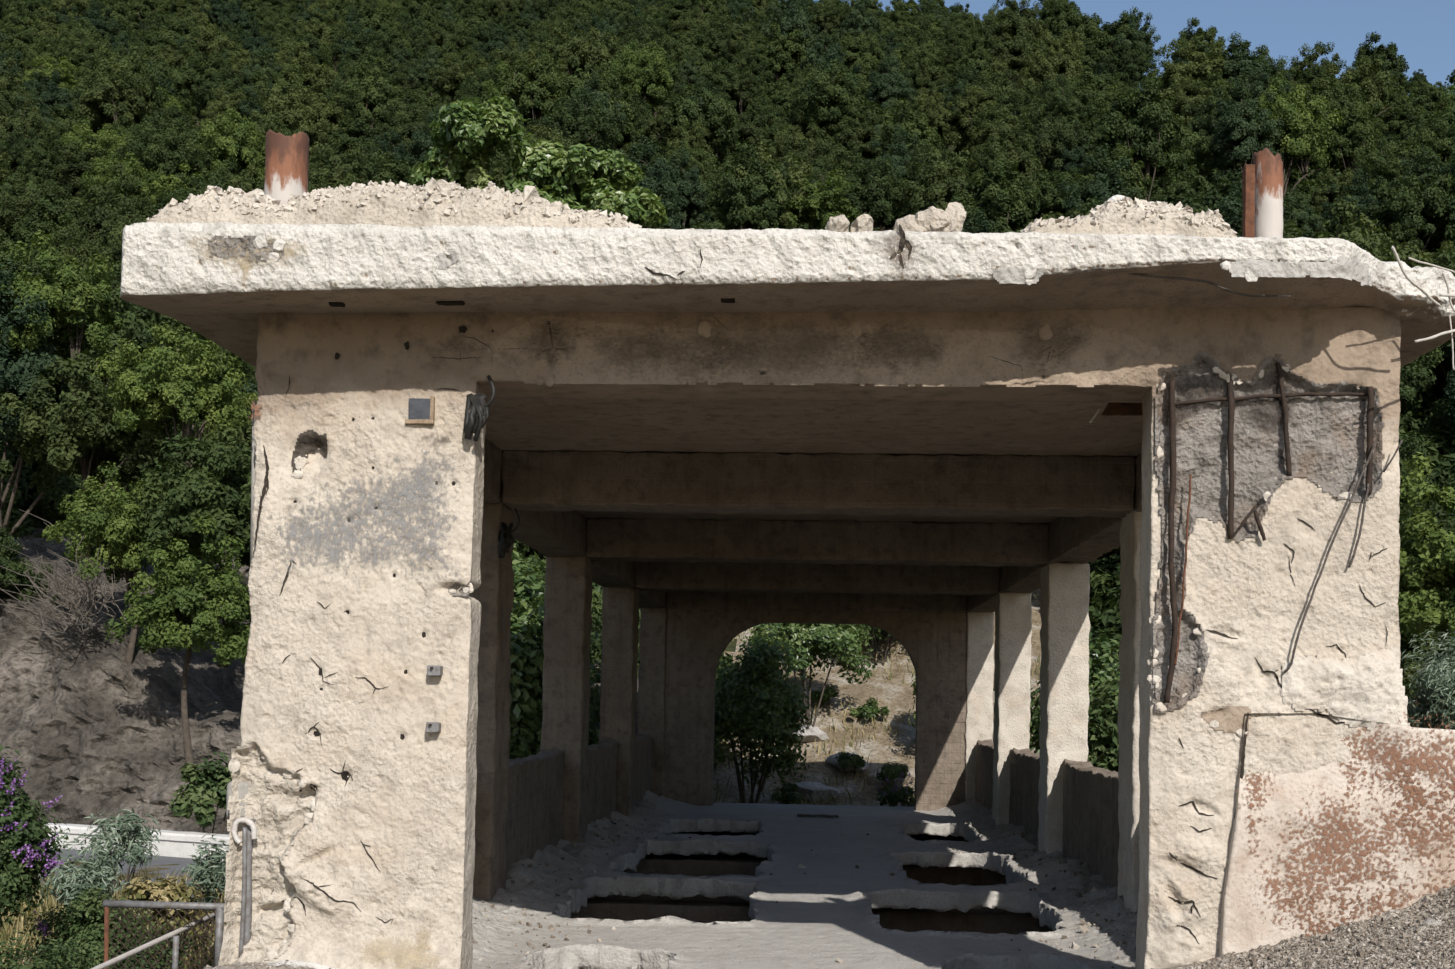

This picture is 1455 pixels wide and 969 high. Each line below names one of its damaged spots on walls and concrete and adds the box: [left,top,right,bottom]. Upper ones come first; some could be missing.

crack [253,445,269,555]
crack [279,560,296,596]
spalling [291,430,328,479]
spalling [487,316,1385,738]
spalling [1280,647,1411,730]
spalling [218,742,320,966]
corrosion [1239,711,1455,937]